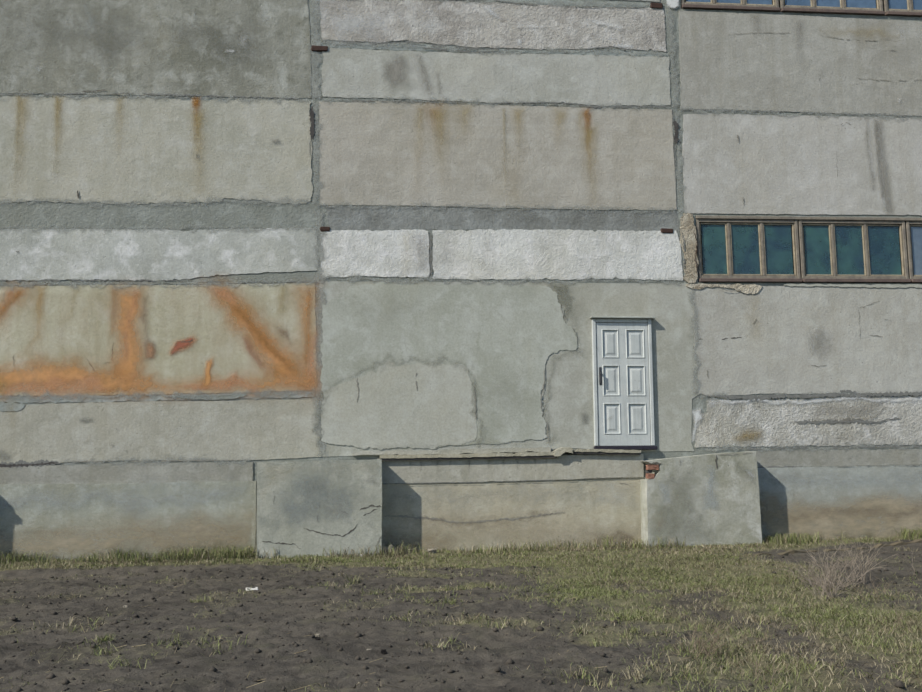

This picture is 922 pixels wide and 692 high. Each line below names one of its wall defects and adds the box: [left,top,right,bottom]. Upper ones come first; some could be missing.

spalling [680,213,762,294]
rust [0,292,166,394]
rust [191,290,314,390]
crack [794,408,902,425]
crack [262,504,566,549]